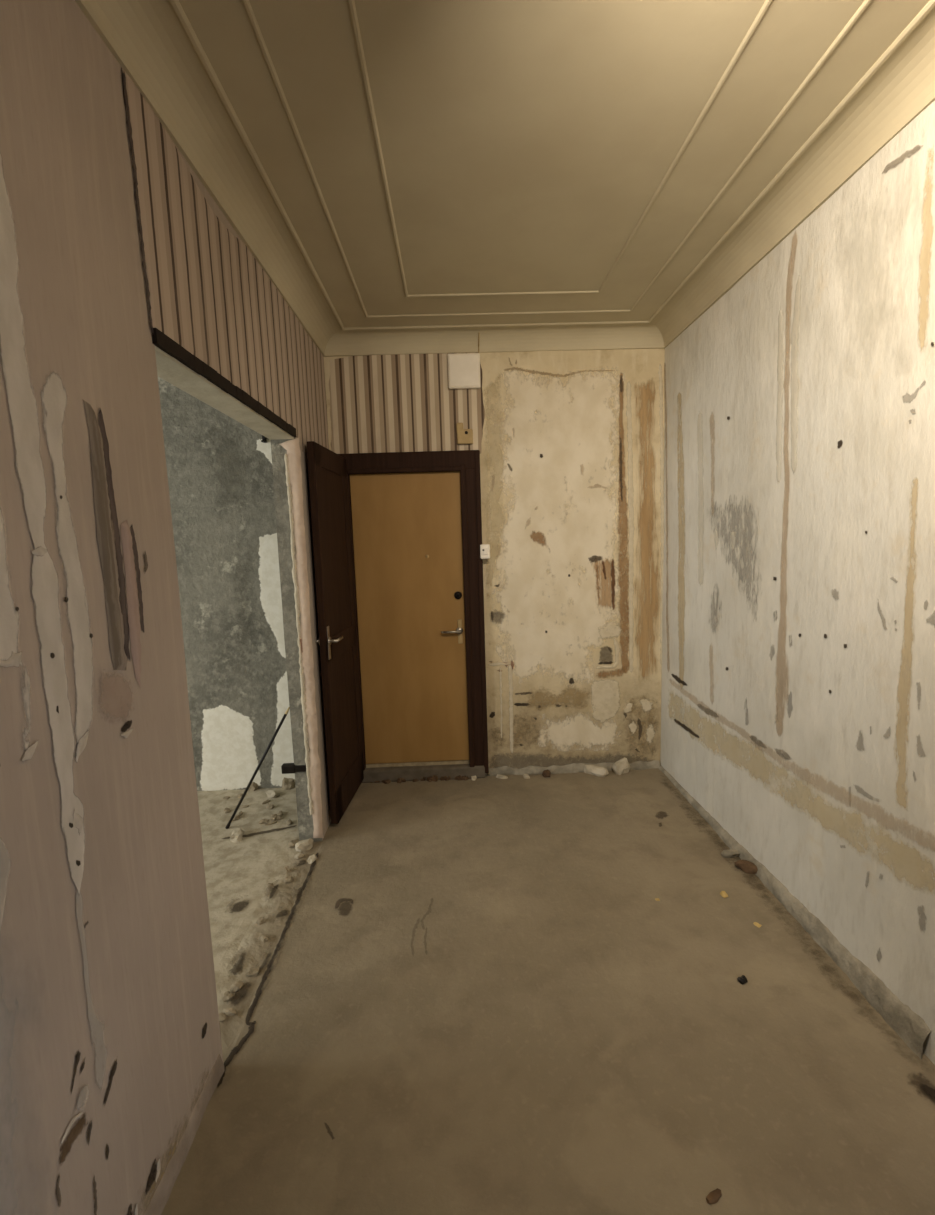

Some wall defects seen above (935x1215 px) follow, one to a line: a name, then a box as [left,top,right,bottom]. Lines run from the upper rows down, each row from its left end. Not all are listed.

flaking render [200,437,324,838]
peeling [591,621,656,757]
spalling [121,720,133,739]
peeling [750,736,790,759]
flaking render [856,727,890,750]
flaking render [56,1113,92,1207]
flaking render [127,1158,161,1215]